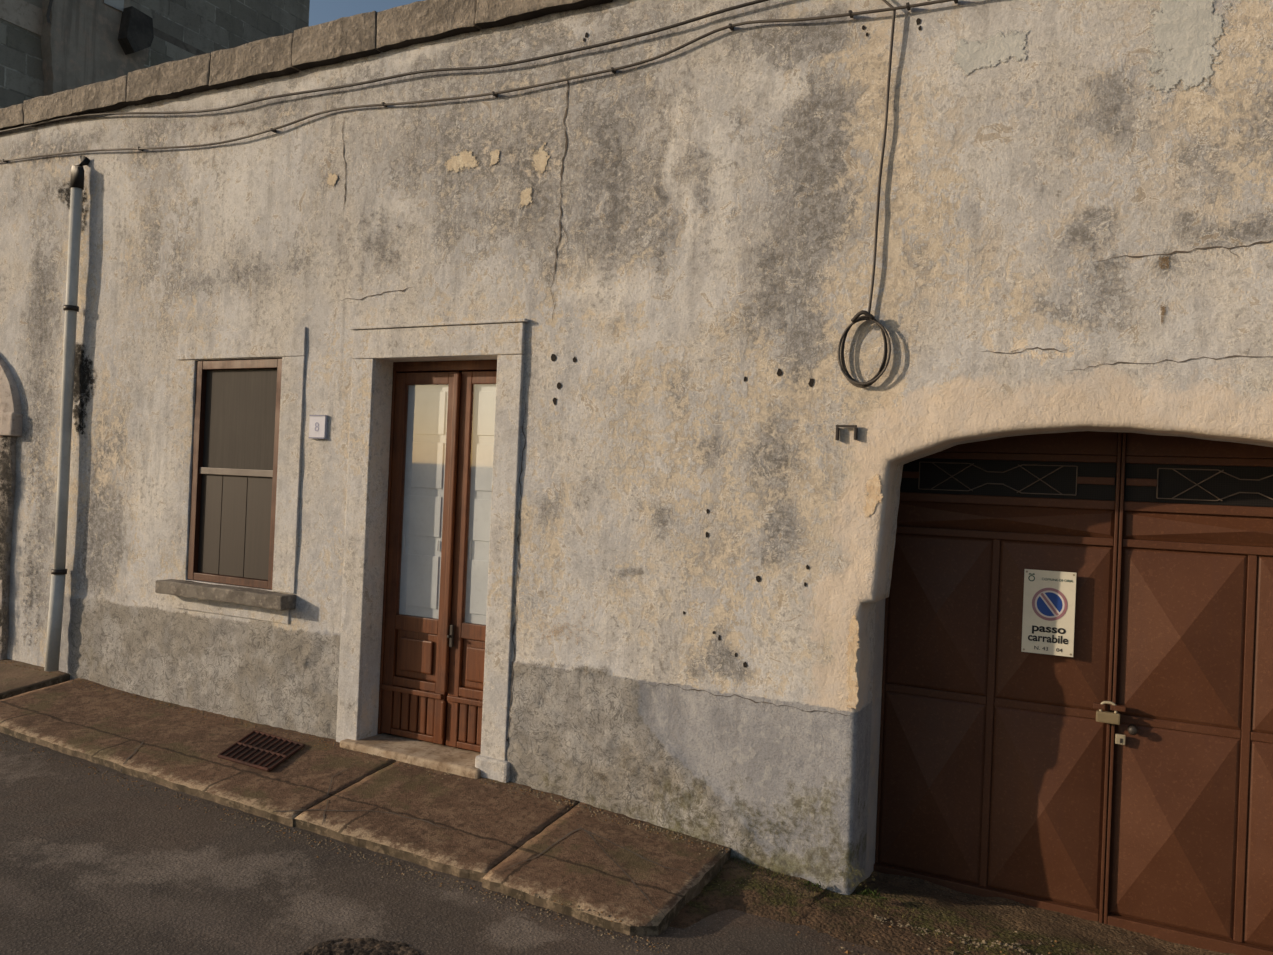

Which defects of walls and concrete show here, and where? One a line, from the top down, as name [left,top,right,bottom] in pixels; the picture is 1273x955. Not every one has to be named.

peeling [443,149,500,173]
peeling [529,143,551,176]
peeling [520,186,533,208]
crack [1096,240,1273,262]
crack [981,347,1273,371]
damp [73,344,96,434]
damp [0,436,13,649]